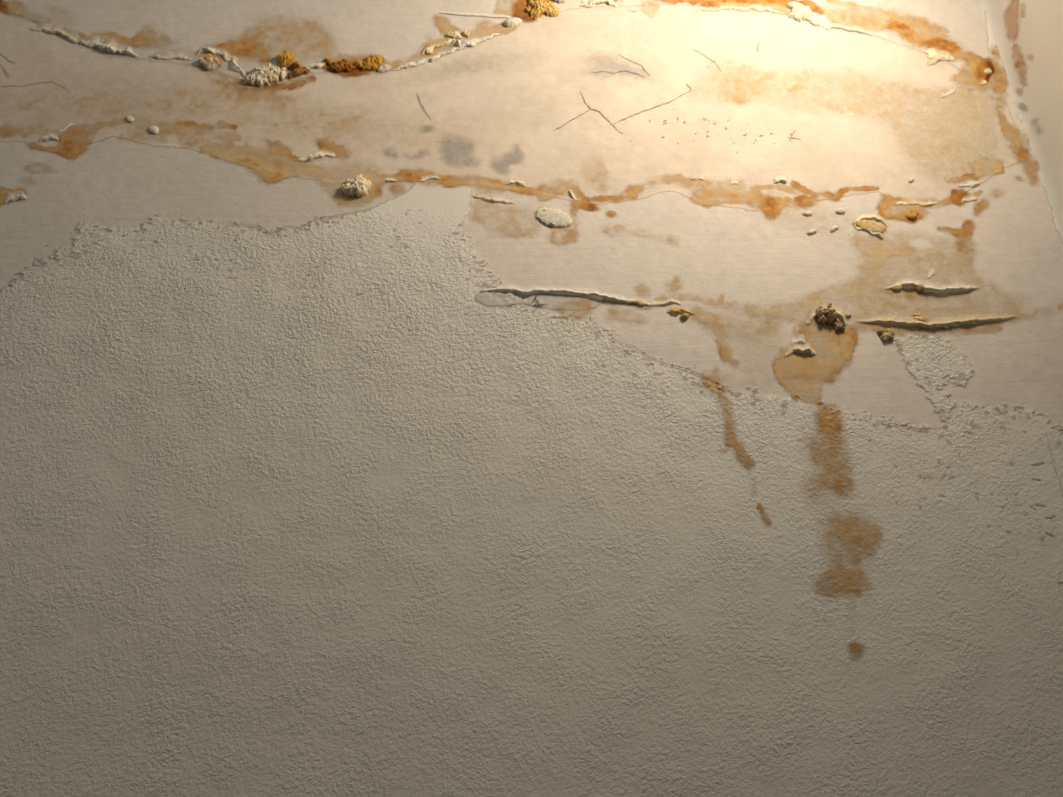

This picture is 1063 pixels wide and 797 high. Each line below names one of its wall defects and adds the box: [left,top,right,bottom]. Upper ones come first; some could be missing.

peeling [3,0,701,81]
peeling [785,0,989,71]
crack [556,56,691,133]
peeling [0,136,415,292]
damp [0,0,1033,495]
peeling [451,75,1063,438]
damp [817,516,881,596]